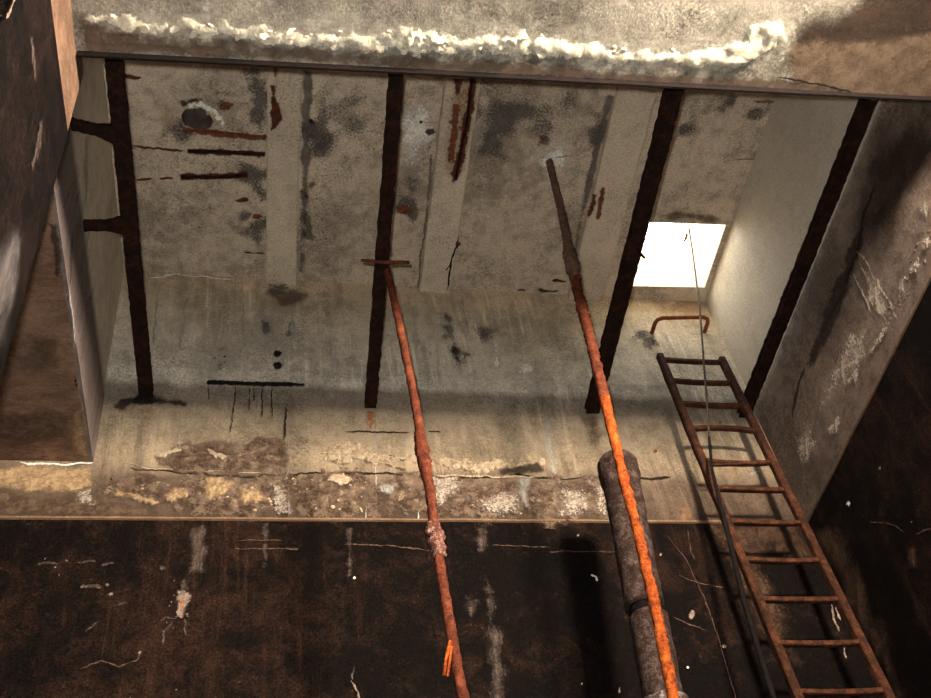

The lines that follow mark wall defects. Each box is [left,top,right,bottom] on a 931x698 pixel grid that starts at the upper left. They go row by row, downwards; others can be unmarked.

spalling [132,98,267,158]
rust [270,68,282,131]
water stain [300,71,368,241]
water stain [79,0,931,170]
water stain [575,95,614,251]
rust [587,187,605,220]
water stain [666,212,716,222]
water stain [858,132,931,231]
crack [792,186,875,416]
peeling [104,437,609,529]
peeling [192,528,205,569]
peeling [162,580,191,643]